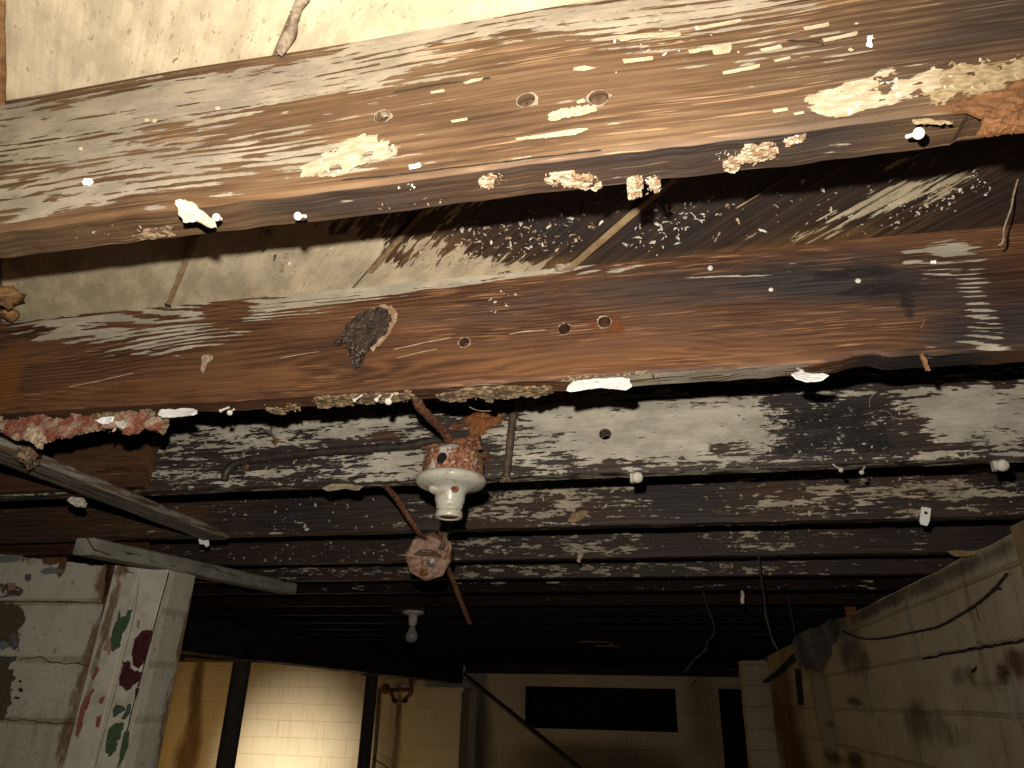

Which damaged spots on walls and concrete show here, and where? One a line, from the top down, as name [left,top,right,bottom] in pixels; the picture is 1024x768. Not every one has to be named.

peeling [679,19,741,55]
peeling [803,22,875,51]
peeling [773,53,1024,118]
peeling [516,99,597,140]
peeling [296,133,398,178]
peeling [719,133,806,173]
peeling [132,199,217,240]
peeling [417,170,743,275]
peeling [436,371,659,403]
peeling [791,371,829,382]
peeling [158,408,197,418]
corrosion [420,405,505,452]